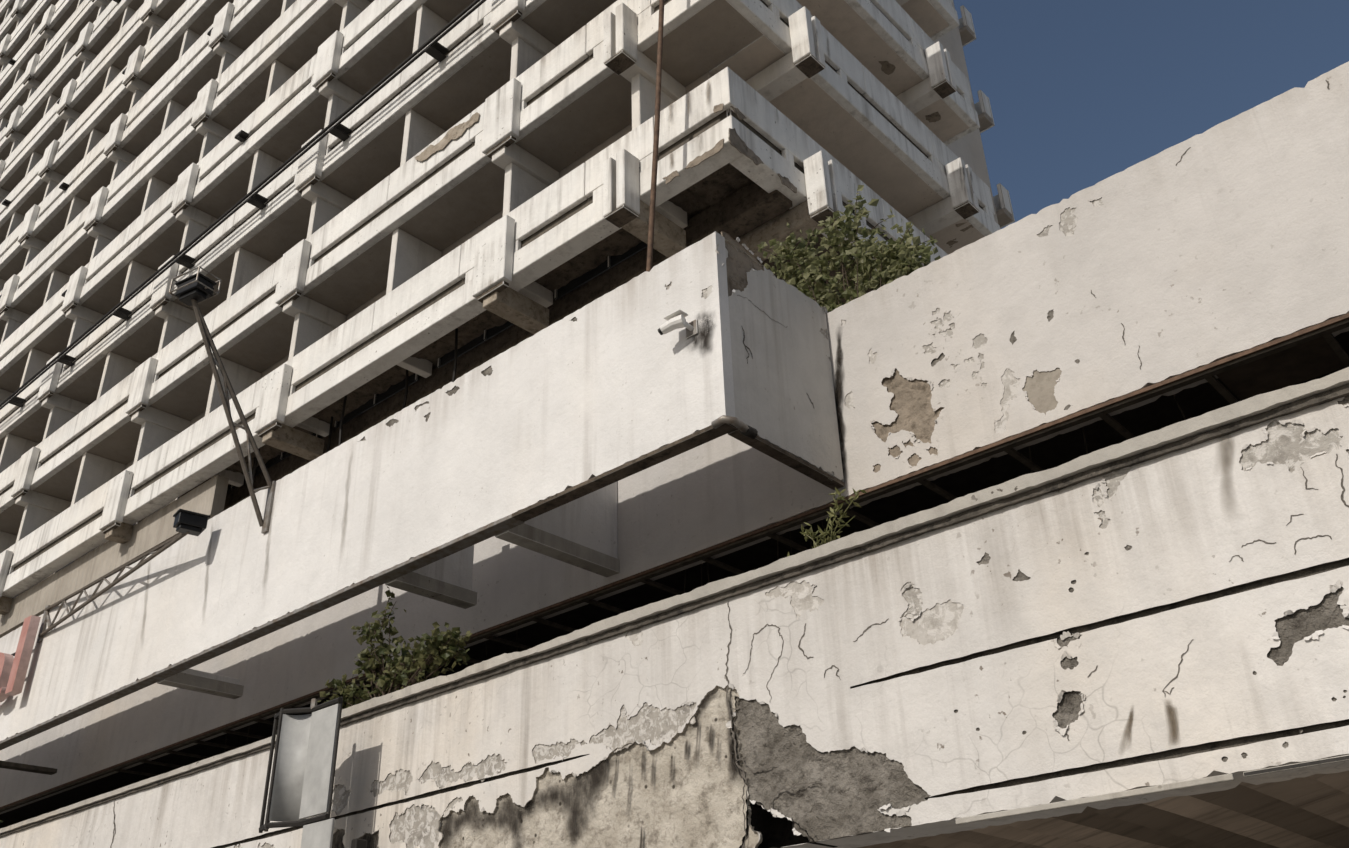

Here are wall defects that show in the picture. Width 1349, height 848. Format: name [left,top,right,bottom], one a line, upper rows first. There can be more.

flaking render [715,231,764,297]
crack [737,295,788,364]
flaking render [870,308,1071,473]
peeling [1239,419,1349,473]
crack [1229,454,1349,562]
flaking render [1267,580,1349,666]
flaking render [331,683,931,848]
crack [725,601,889,848]
flaking render [1052,690,1086,736]